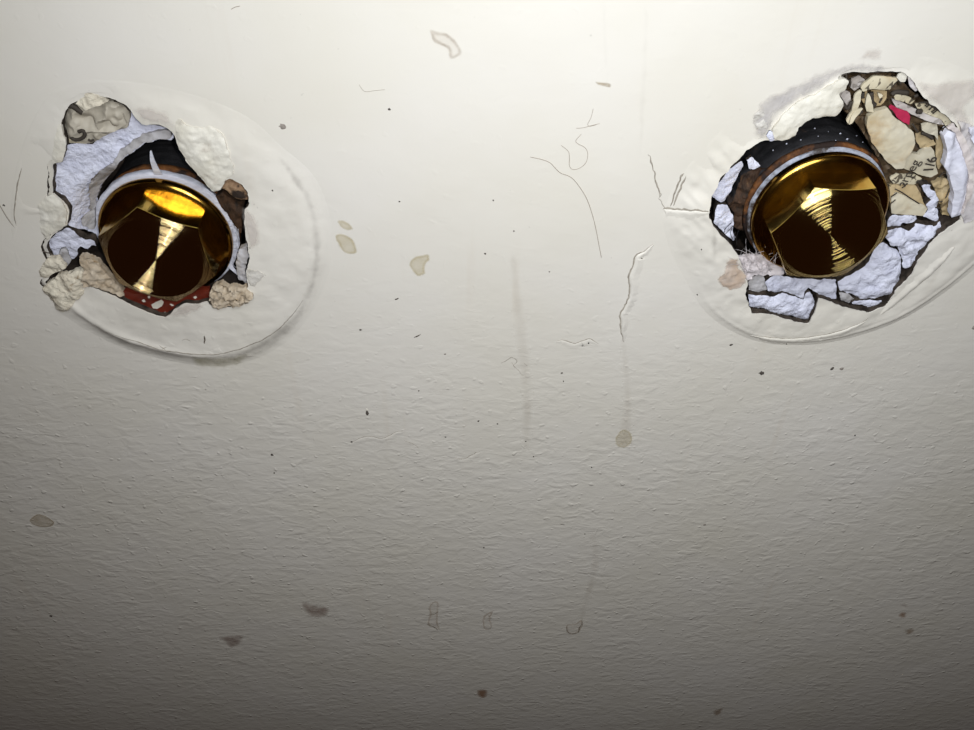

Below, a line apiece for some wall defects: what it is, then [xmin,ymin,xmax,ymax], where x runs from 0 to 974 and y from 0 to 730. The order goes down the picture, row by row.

peeling [758,75,829,134]
spalling [841,109,872,150]
spalling [40,112,174,287]
peeling [240,214,256,246]
crack [648,155,710,221]
spalling [709,159,759,255]
spalling [745,179,954,319]
peeling [123,257,250,312]
crack [619,244,654,342]
crack [556,338,599,349]